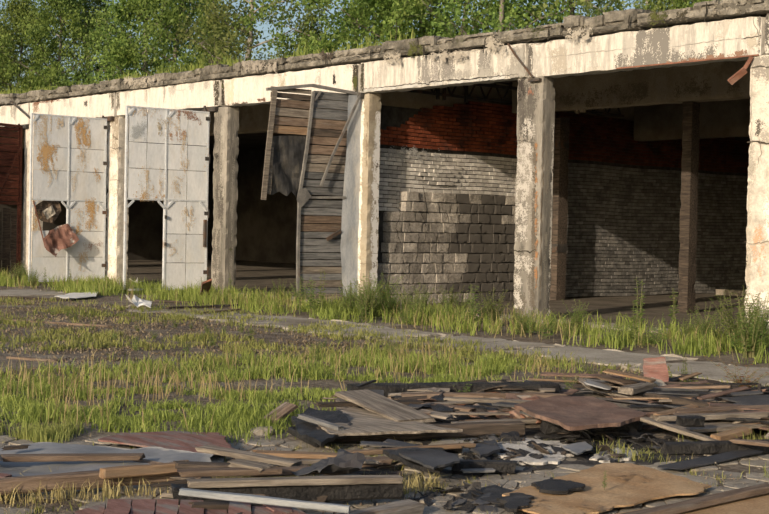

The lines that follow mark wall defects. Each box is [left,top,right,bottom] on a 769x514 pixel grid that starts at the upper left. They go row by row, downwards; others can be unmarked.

peeling [238,59,277,73]
peeling [430,48,469,63]
spalling [485,35,506,55]
spalling [565,25,593,43]
peeling [739,32,769,143]
corrosion [33,114,64,188]
corrosion [70,117,101,191]
corrosion [132,107,201,201]
corrosion [71,197,98,235]
peeling [513,119,537,314]
peeling [747,191,769,240]
peeling [745,244,769,328]